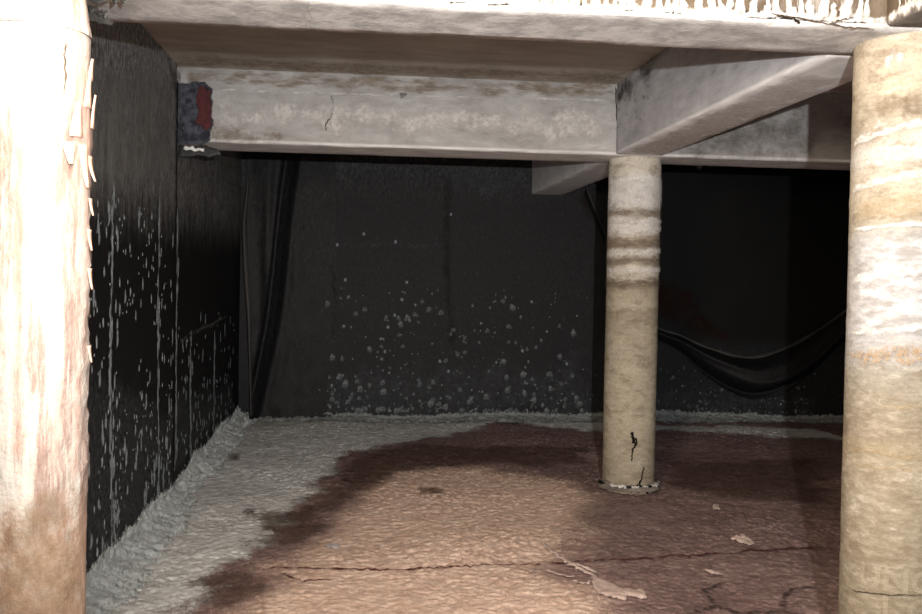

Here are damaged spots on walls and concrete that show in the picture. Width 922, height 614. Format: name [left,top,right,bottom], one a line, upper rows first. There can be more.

leakage [425,0,922,23]
peeling [61,59,97,216]
leakage [86,68,613,614]
crack [630,432,649,494]
crack [253,546,832,582]